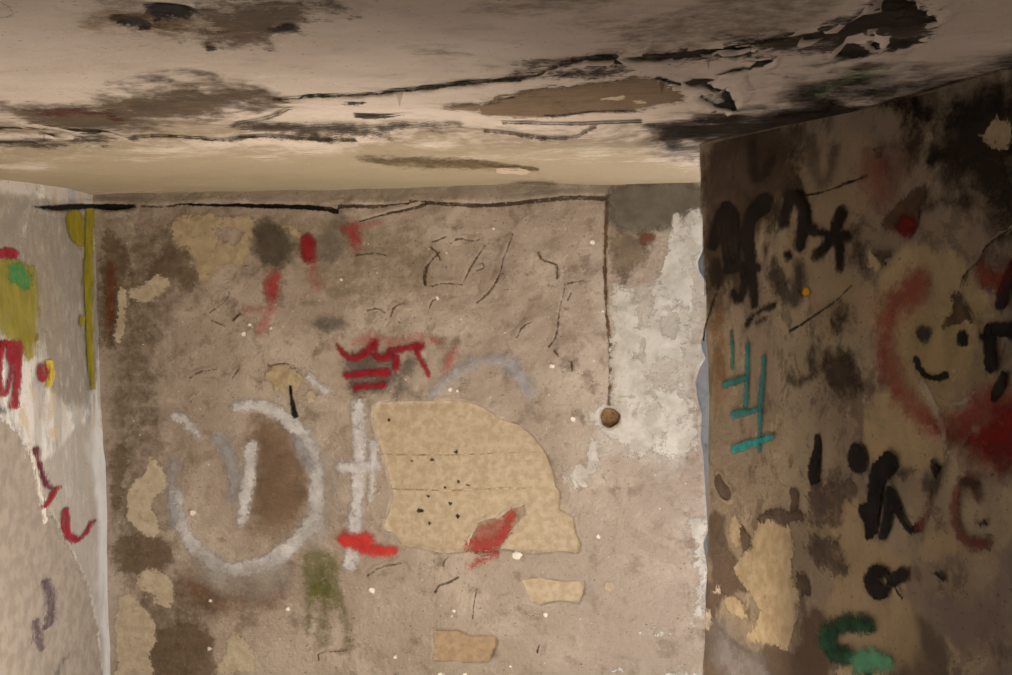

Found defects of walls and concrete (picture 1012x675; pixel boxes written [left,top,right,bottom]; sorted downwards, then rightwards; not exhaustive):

damp [135,0,361,51]
crack [0,0,967,151]
crack [801,175,868,197]
crack [24,188,615,406]
spalling [368,208,703,567]
damp [109,442,130,511]
damp [113,534,174,575]
peeling [680,469,857,653]
spalling [517,572,590,617]
damp [148,623,217,675]
spalling [427,609,503,675]
peeling [834,653,893,675]